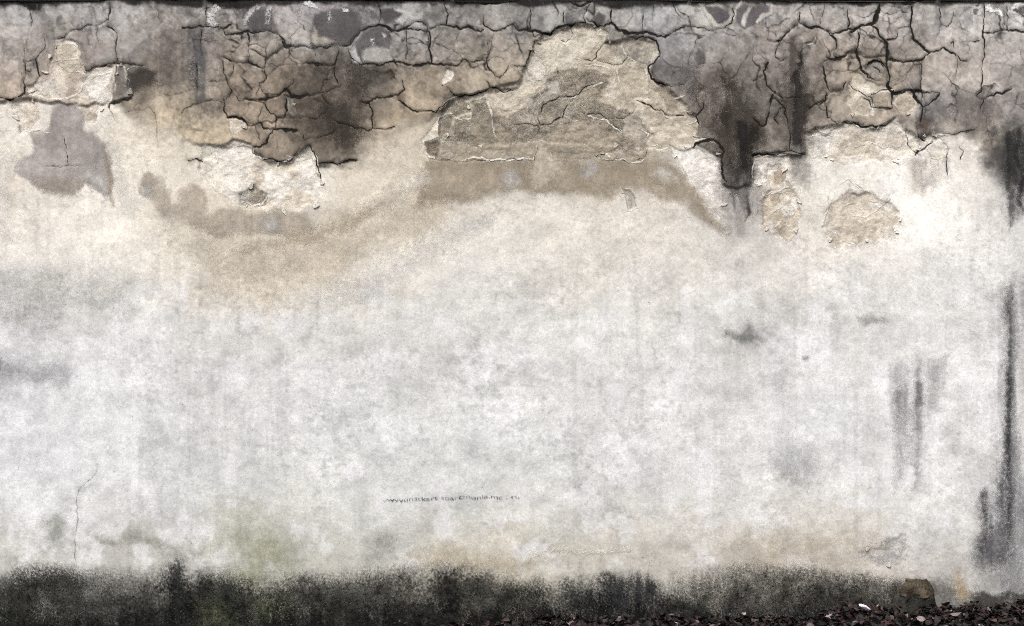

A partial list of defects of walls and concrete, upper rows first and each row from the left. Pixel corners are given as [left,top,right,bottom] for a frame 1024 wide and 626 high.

damp [0,104,132,215]
crack [0,3,143,101]
peeling [10,39,135,134]
peeling [198,116,326,215]
damp [120,0,415,149]
damp [140,140,719,243]
peeling [420,23,728,229]
crack [175,0,1024,182]
damp [509,0,792,28]
peeling [752,62,948,248]
damp [985,127,1024,215]
damp [0,563,901,626]